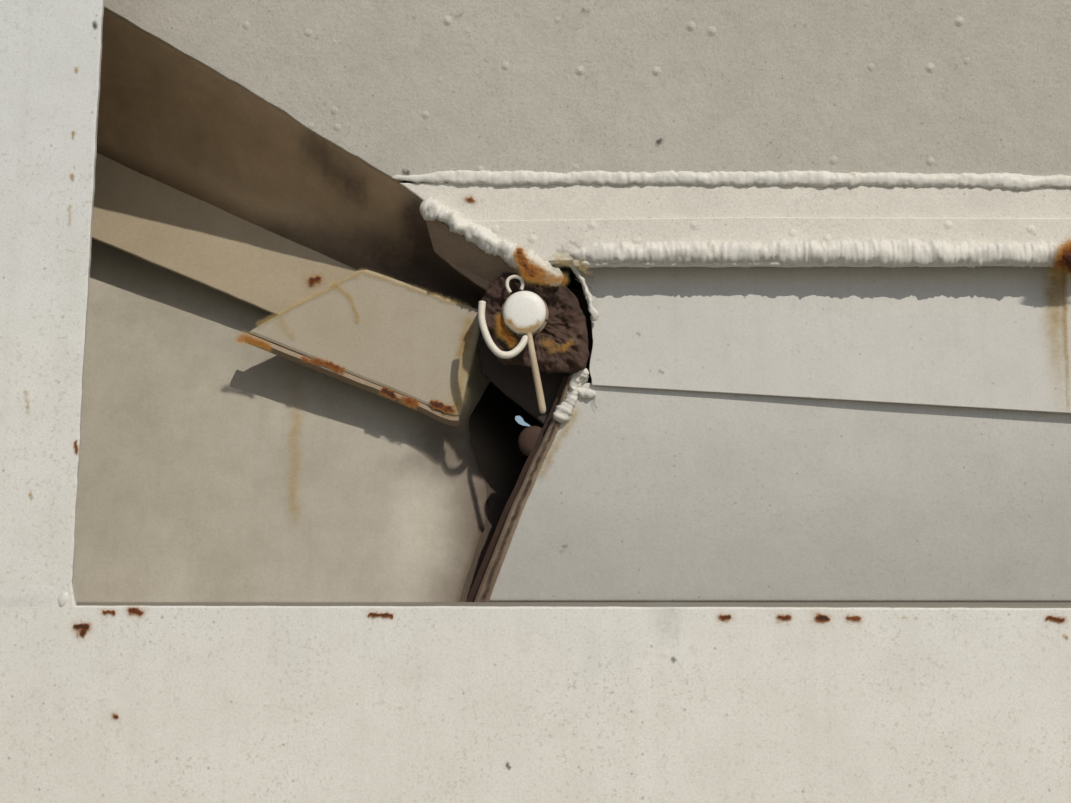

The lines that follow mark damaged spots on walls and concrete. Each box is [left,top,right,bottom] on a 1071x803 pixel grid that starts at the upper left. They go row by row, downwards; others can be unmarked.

corrosion [514,247,567,284]
corrosion [1047,240,1071,341]
corrosion [237,334,270,350]
corrosion [496,315,542,347]
corrosion [302,356,345,373]
corrosion [380,387,459,413]